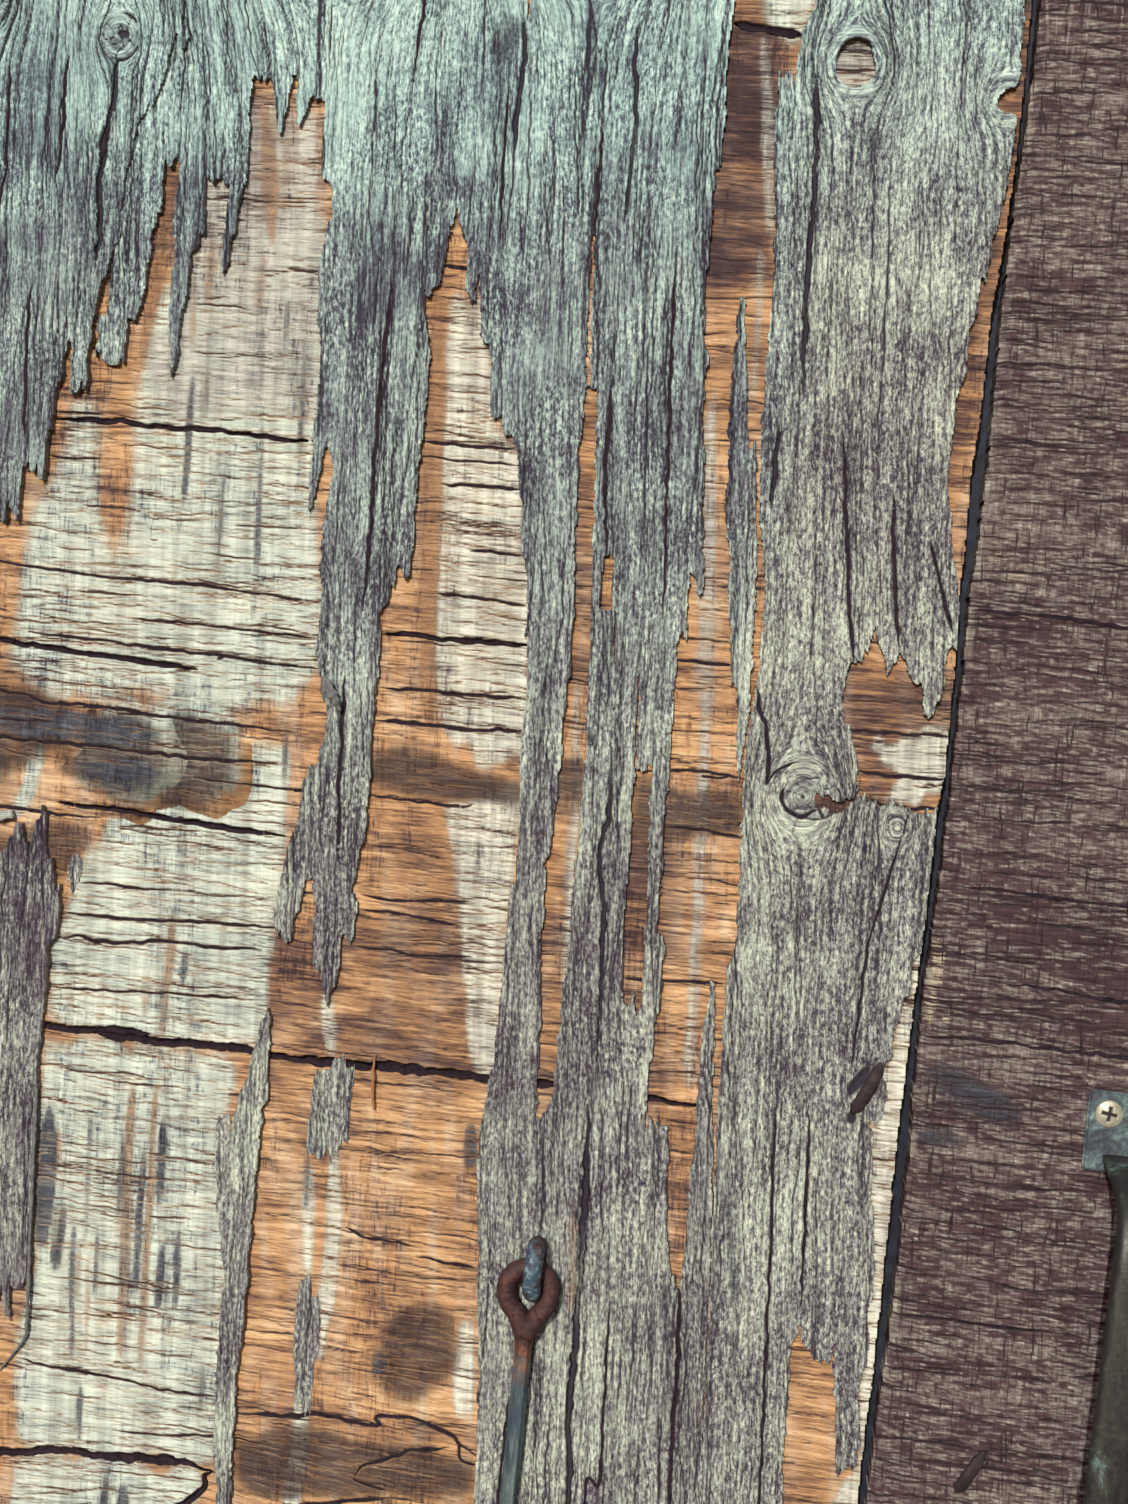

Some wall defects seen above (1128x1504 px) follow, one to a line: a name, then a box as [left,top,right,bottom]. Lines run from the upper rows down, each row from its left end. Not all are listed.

peeling [0,317,59,524]
damp [0,687,233,872]
crack [0,560,523,866]
peeling [272,540,387,1006]
peeling [844,555,960,719]
crack [67,882,274,950]
crack [358,895,471,957]
crack [44,986,490,1082]
damp [464,1125,479,1167]
peeling [699,807,936,1504]
crack [0,1358,508,1504]
damp [372,1304,474,1418]